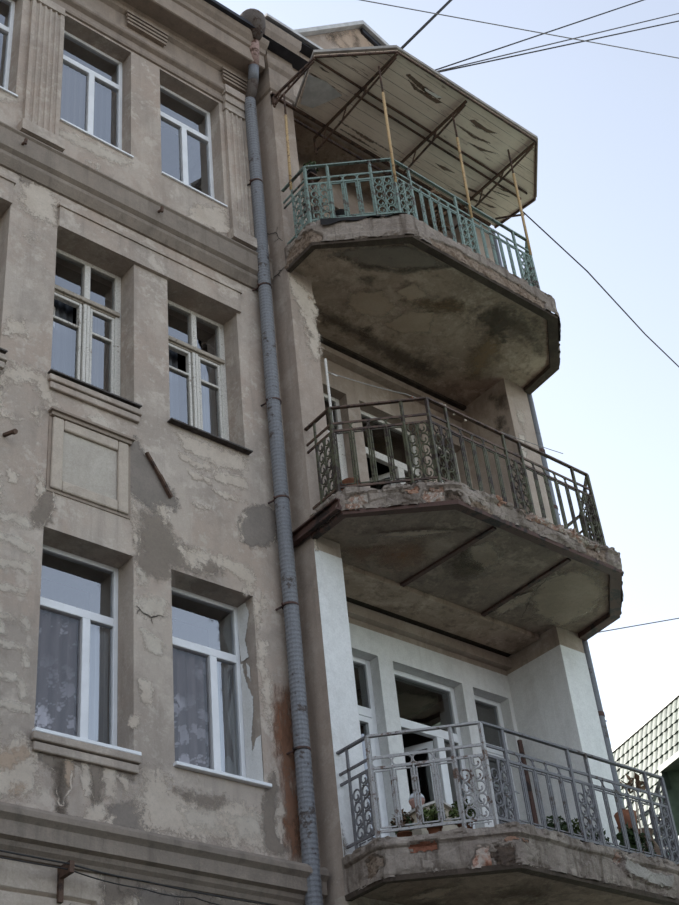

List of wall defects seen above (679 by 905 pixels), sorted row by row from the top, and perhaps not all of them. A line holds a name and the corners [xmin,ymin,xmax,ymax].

peeling [285,230,323,359]
spalling [333,237,545,308]
water stain [323,314,437,377]
spalling [342,493,370,511]
spalling [401,486,510,515]
peeling [496,569,607,627]
peeling [105,432,288,854]
rust [274,688,301,859]
spalling [408,840,438,854]
spalling [471,836,529,869]